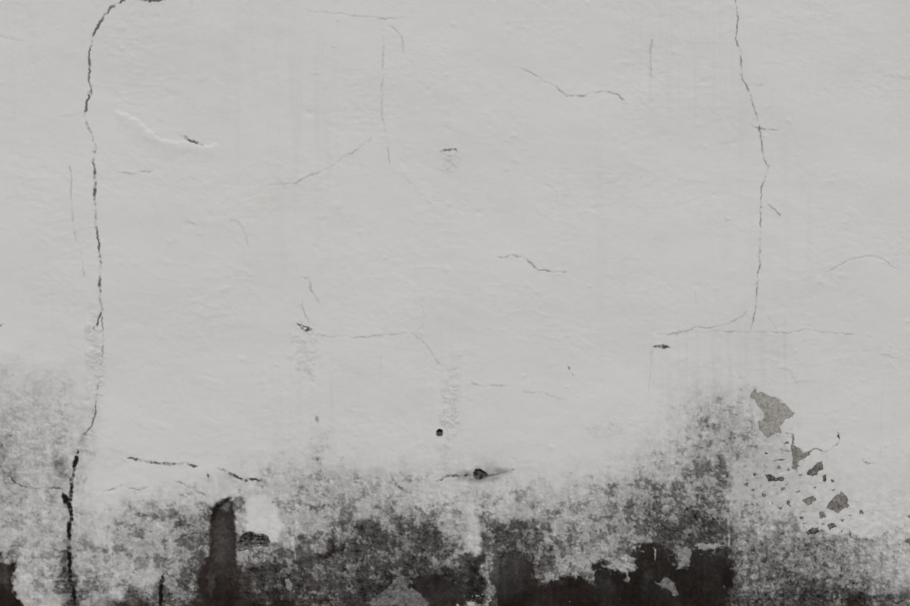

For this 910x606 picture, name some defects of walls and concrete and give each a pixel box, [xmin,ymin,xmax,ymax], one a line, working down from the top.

crack [85,0,124,111]
crack [127,457,259,482]
water stain [662,441,731,493]
peeling [745,389,864,540]
crack [55,451,79,569]
water stain [0,552,24,606]
water stain [53,546,75,606]
water stain [190,501,295,606]
peeling [366,575,430,606]
spalling [456,593,497,606]
water stain [489,542,736,606]
water stain [833,584,910,606]